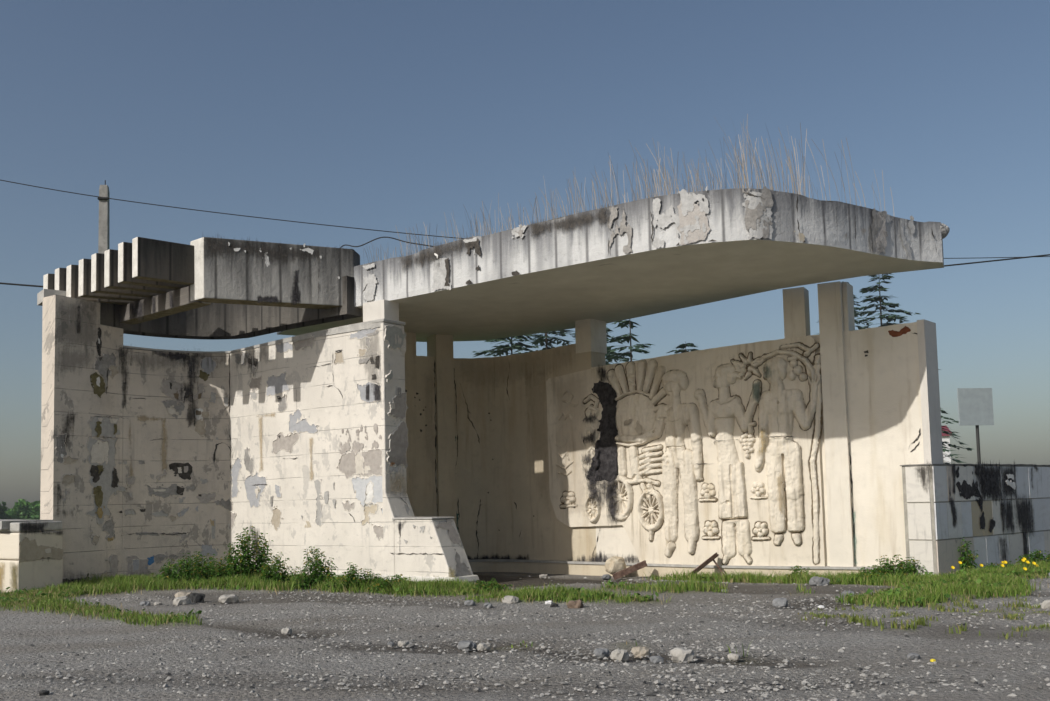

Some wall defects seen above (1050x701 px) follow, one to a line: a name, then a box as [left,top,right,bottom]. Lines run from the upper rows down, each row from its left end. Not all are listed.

spalling [651,186,716,249]
spalling [742,186,773,240]
water stain [207,238,322,305]
water stain [119,348,127,408]
flaking render [53,416,284,584]
water stain [155,352,198,425]
peeling [234,351,319,454]
peeling [301,381,427,540]
peeling [334,325,406,365]
crack [434,360,481,559]
water stain [582,366,618,522]
water stain [943,458,1034,561]